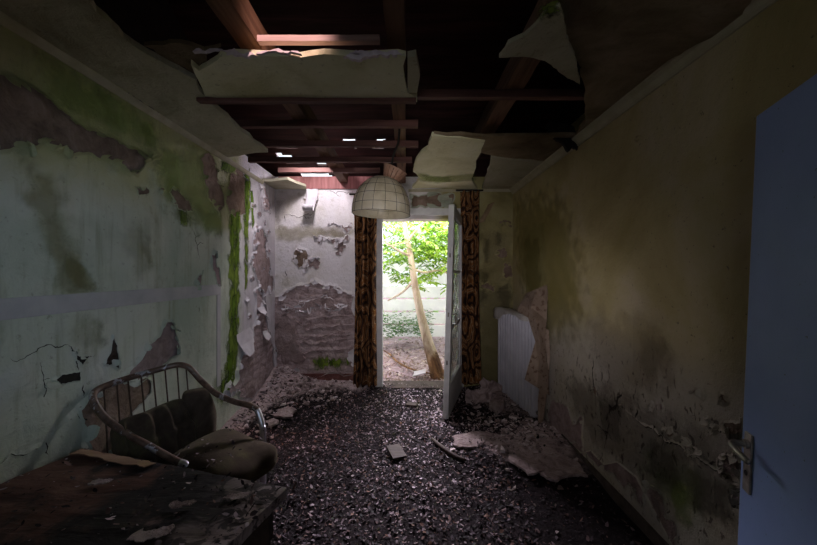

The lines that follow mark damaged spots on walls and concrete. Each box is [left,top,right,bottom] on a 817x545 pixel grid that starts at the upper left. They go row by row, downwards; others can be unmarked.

peeling [0,71,161,191]
flaking render [198,151,355,404]
crack [0,344,96,464]
peeling [79,319,181,454]
crack [590,360,737,483]
peeling [722,416,743,440]